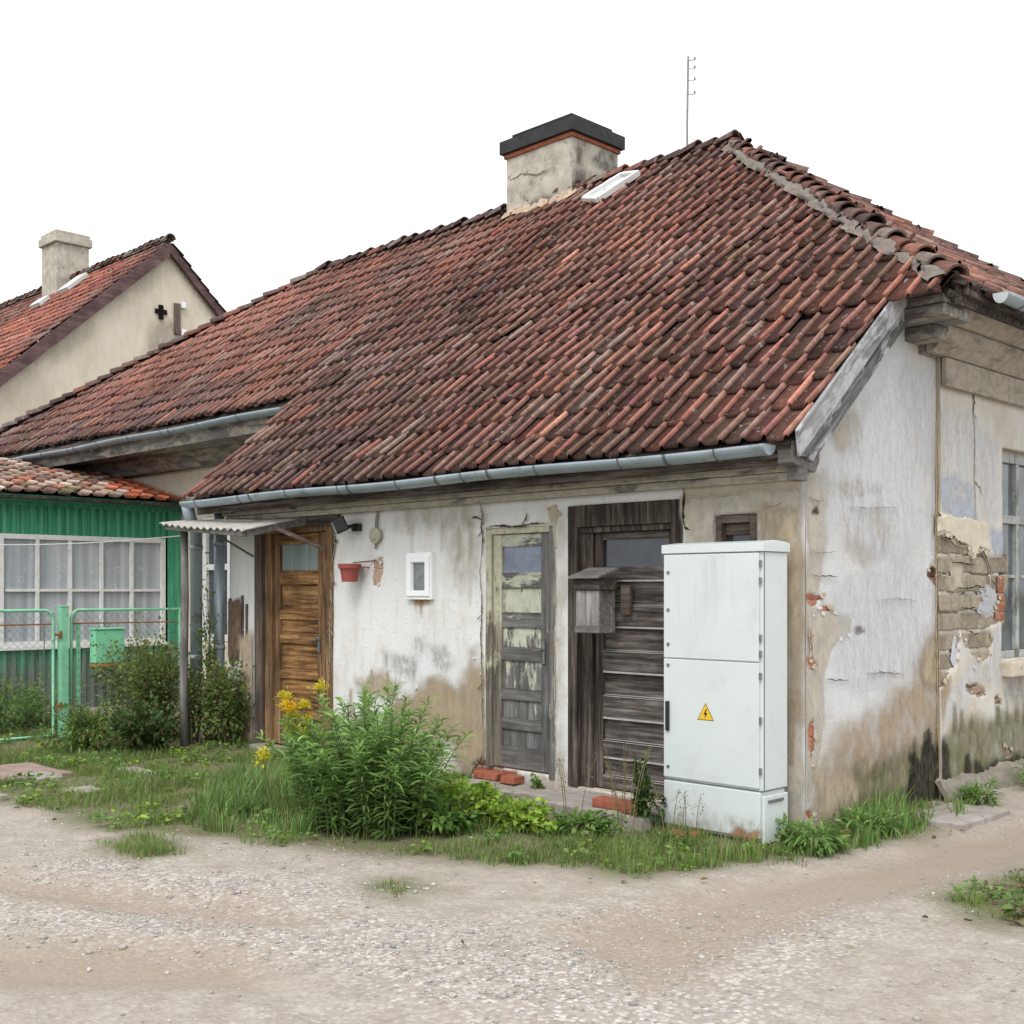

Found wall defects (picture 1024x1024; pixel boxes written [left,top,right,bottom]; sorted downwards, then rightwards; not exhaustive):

spalling [370,557,383,586]
spalling [927,514,1008,687]
peeling [680,472,881,828]
leakage [350,670,396,723]
spalling [964,681,1003,704]
leakage [815,635,973,827]
leakage [965,754,1024,774]